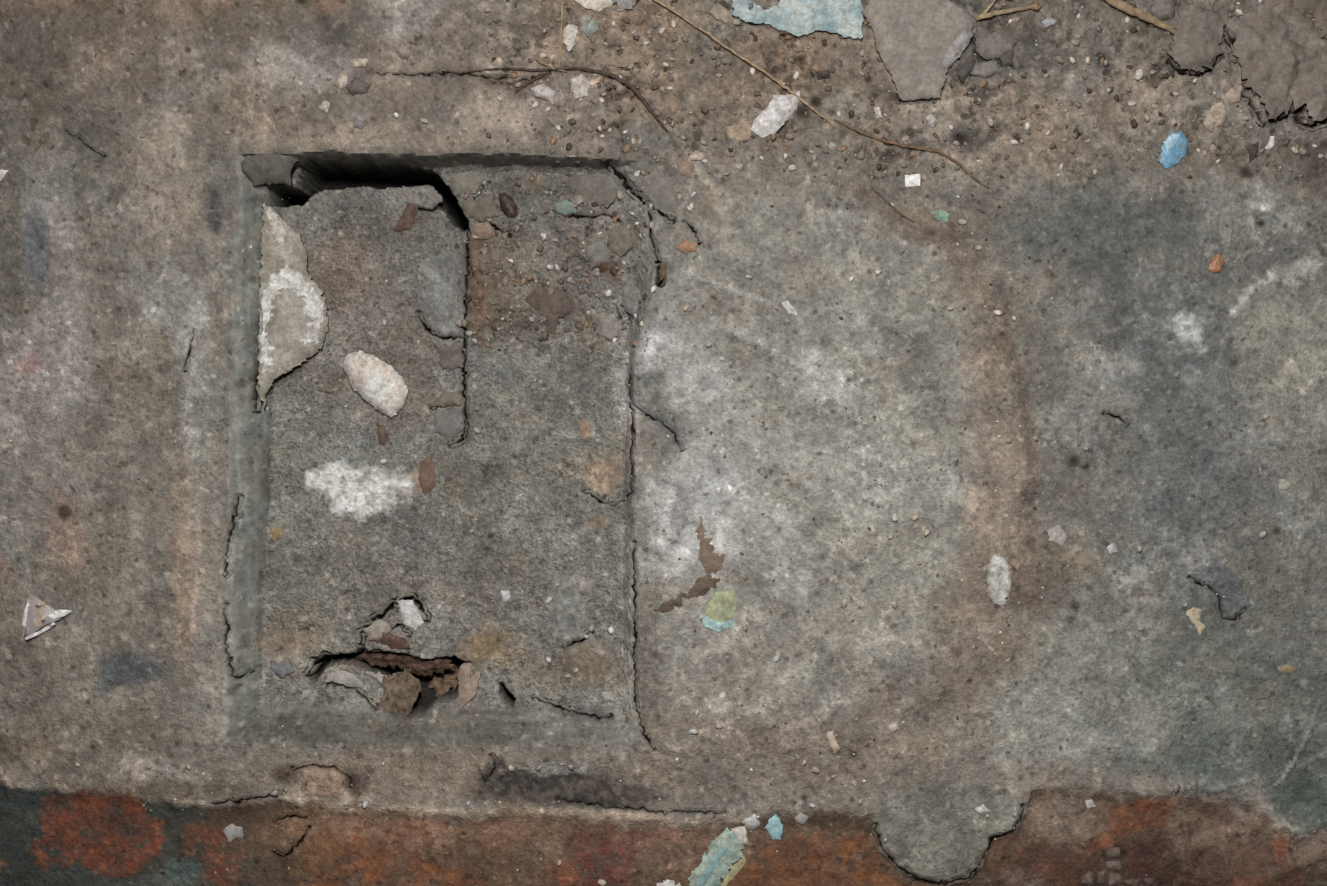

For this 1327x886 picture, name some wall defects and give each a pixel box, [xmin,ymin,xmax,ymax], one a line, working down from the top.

flaking render [689,150,705,160]
crack [597,300,630,340]
flaking render [782,301,797,316]
crack [582,370,684,509]
spalling [223,149,698,886]
spalling [1047,525,1066,546]
crack [220,497,253,682]
crack [532,542,655,752]
peeling [727,814,905,886]
corrosion [1004,795,1175,886]
corrosion [1192,828,1327,886]